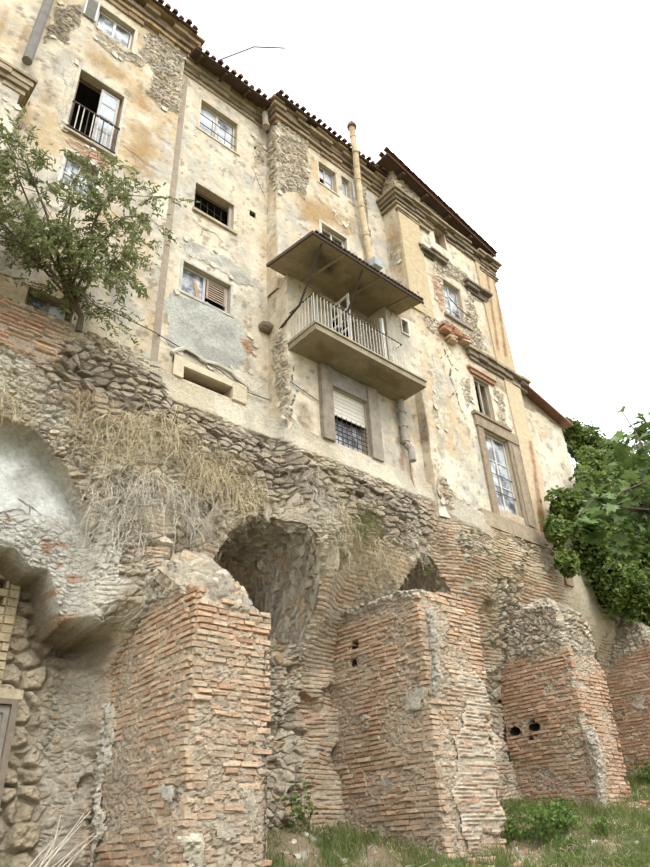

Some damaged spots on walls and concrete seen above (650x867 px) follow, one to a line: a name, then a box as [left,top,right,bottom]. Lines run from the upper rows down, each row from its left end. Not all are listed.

flaking render [93,26,186,117]
flaking render [251,119,311,203]
flaking render [417,259,487,352]
flaking render [163,289,294,420]